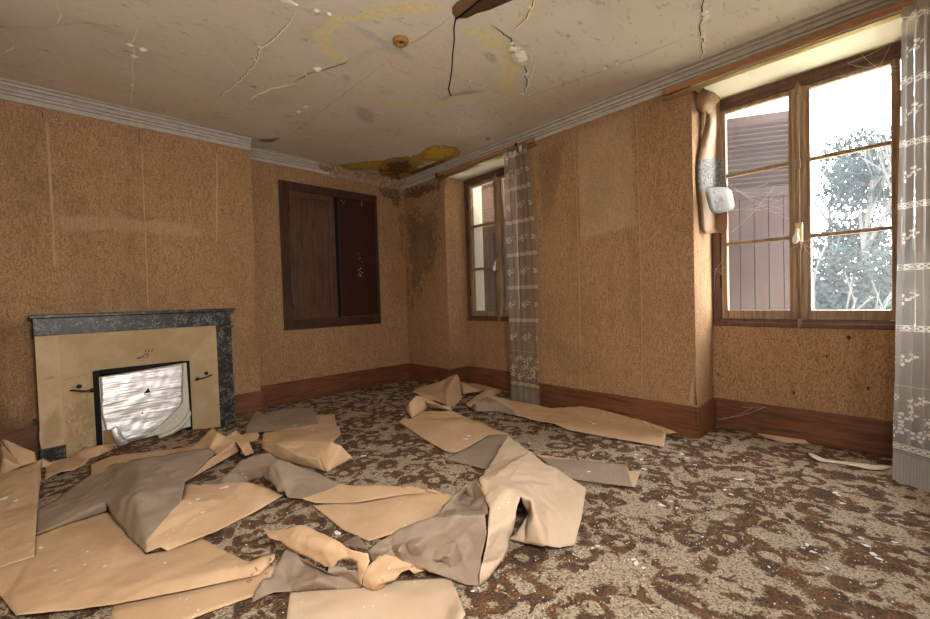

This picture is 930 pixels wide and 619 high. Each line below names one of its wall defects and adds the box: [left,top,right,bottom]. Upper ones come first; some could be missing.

crack [0,0,710,137]
damp [309,0,541,125]
damp [332,129,506,321]
peeling [696,88,735,234]